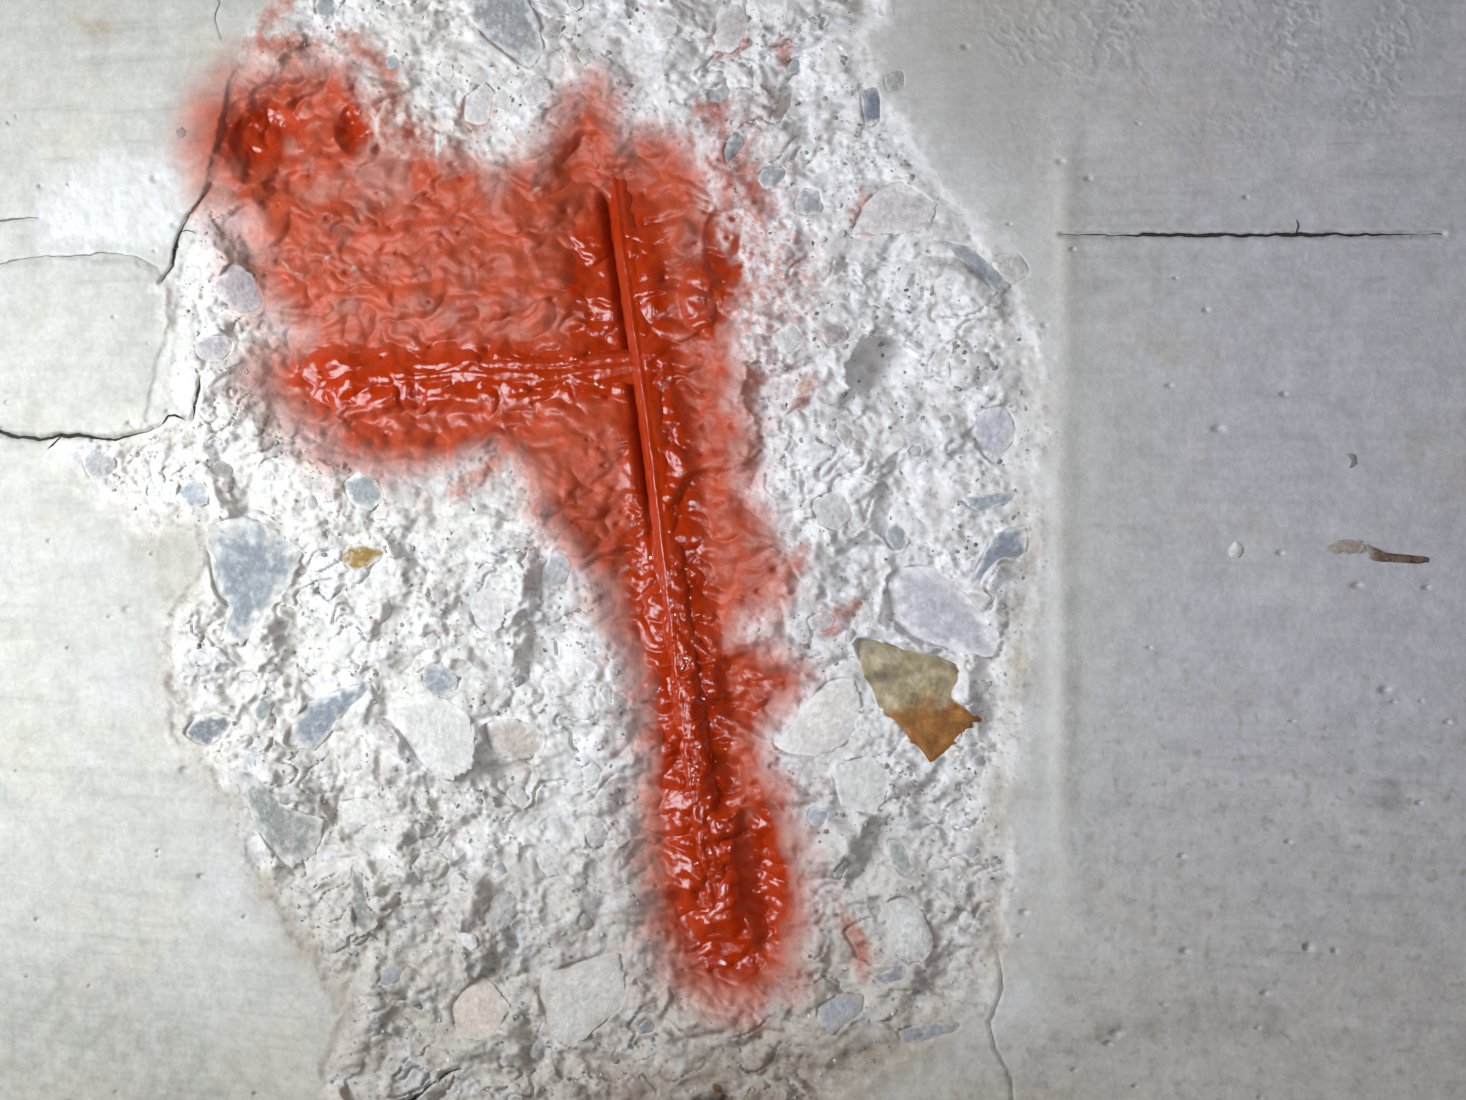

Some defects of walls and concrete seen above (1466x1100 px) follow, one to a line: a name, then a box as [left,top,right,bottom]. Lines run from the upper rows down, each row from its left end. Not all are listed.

crack [0,191,208,281]
crack [1064,220,1442,238]
crack [0,377,200,448]
spalling [62,0,1052,1100]